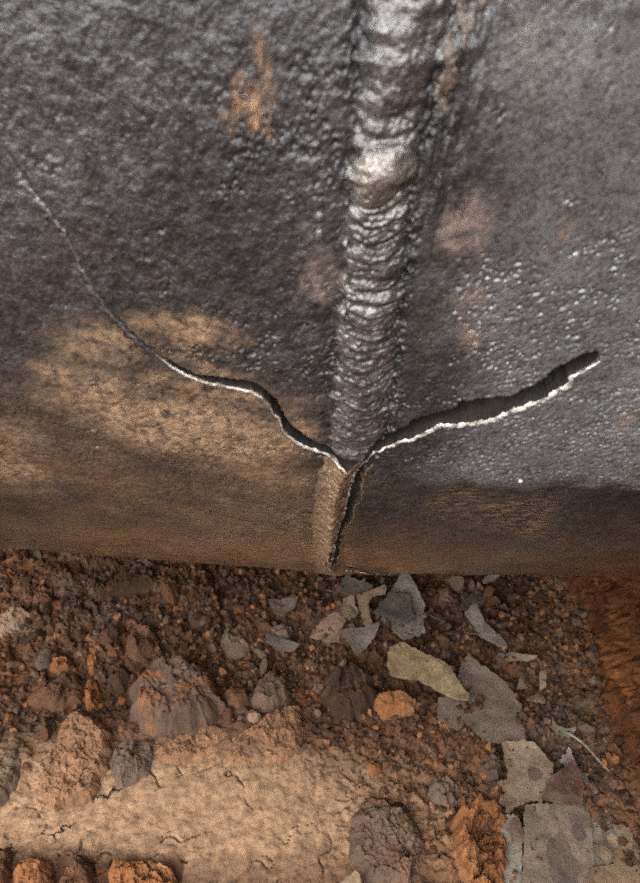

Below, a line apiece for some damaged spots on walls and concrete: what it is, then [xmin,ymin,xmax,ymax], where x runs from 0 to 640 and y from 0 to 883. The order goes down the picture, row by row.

rust [236,93,260,129]
crack [5,153,603,575]